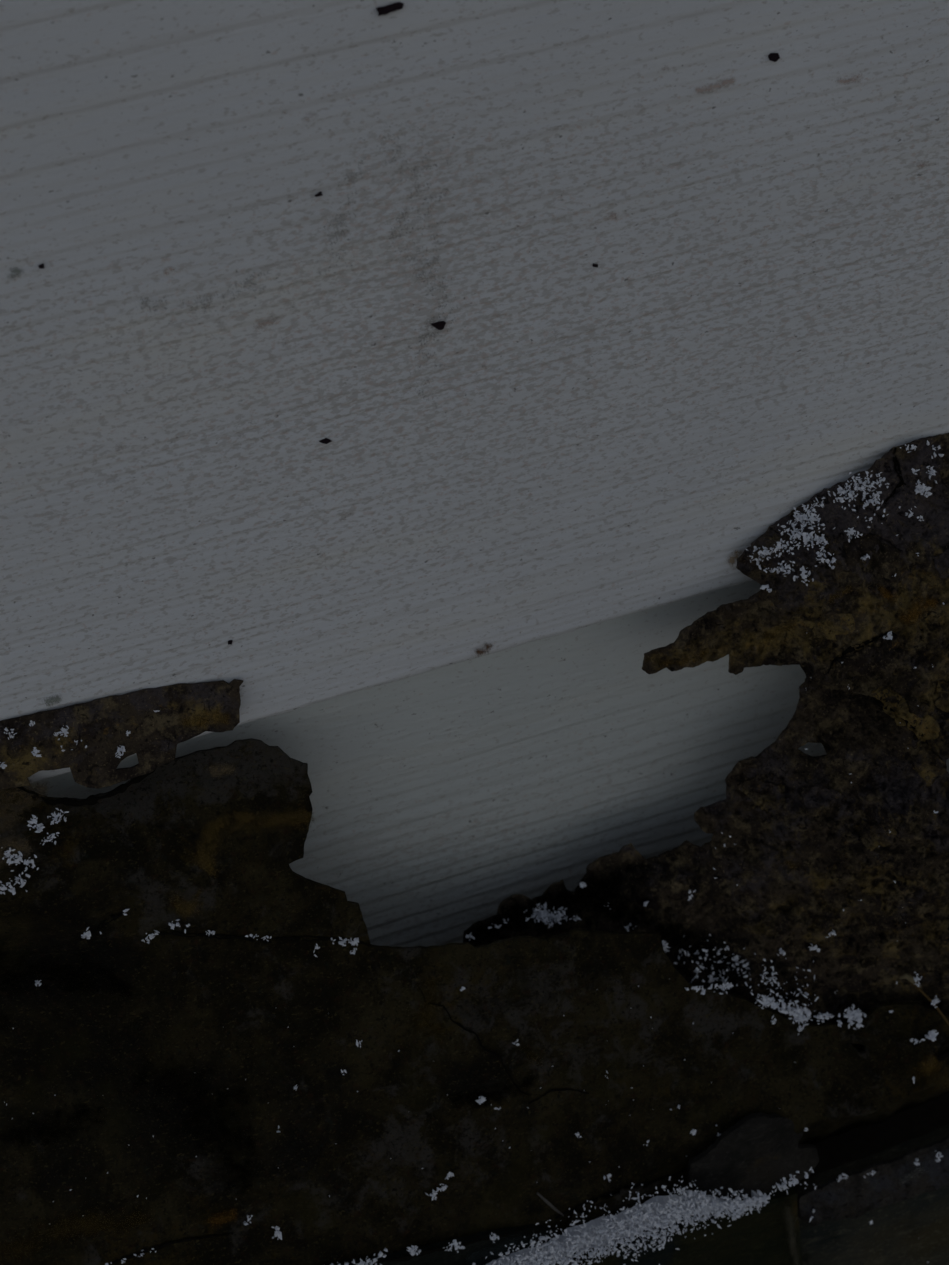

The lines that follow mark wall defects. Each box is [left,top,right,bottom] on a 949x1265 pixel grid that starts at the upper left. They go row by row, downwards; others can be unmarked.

corrosion [463,433,949,1024]
water stain [467,1232,551,1265]